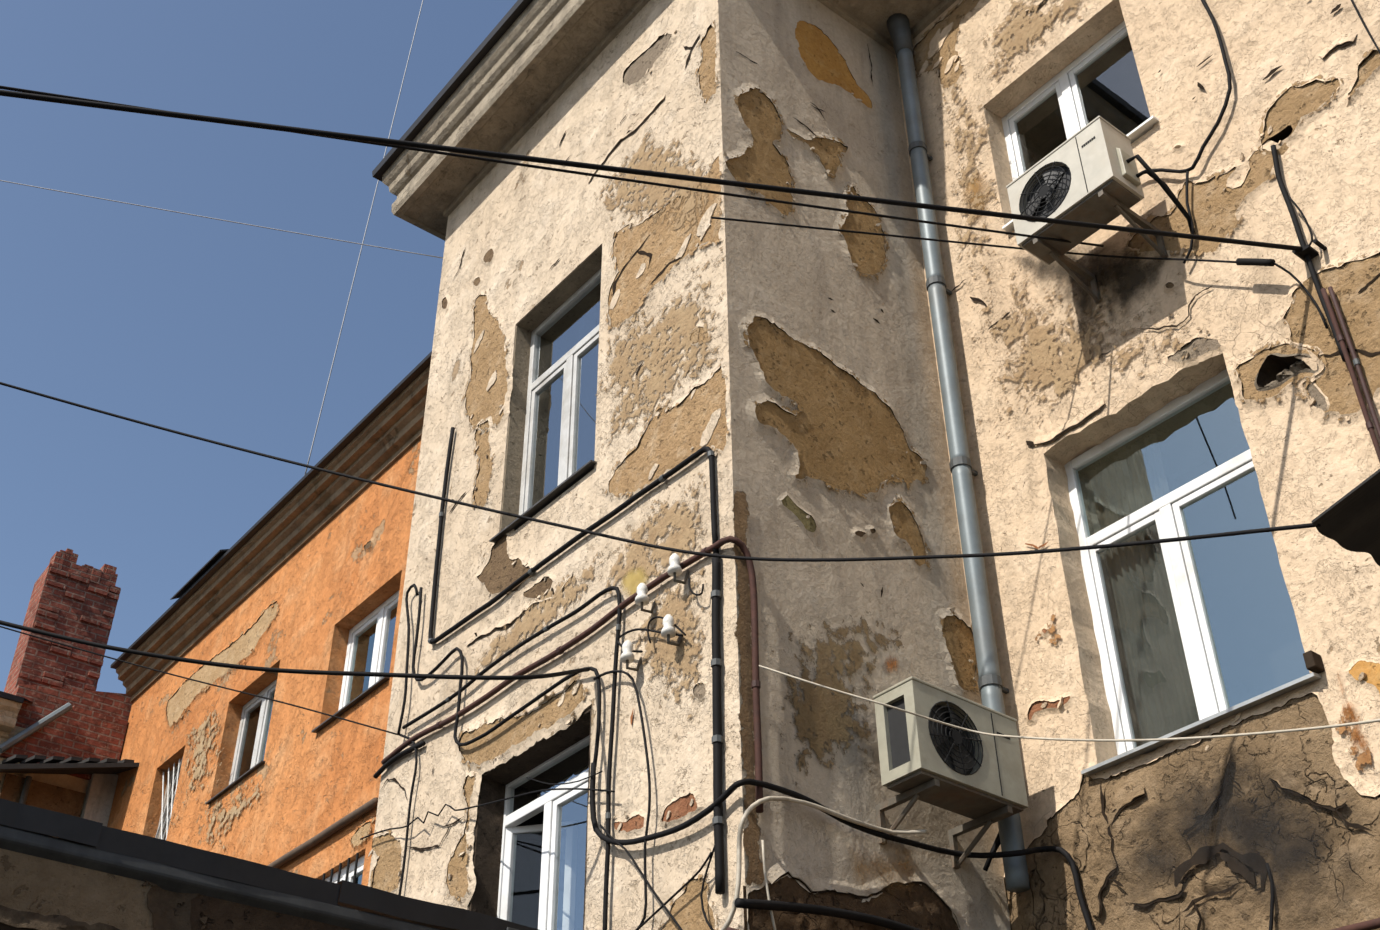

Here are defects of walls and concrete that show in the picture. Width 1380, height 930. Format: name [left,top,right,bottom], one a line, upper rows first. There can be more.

crack [684,34,700,68]
crack [559,95,665,183]
leakage [1022,249,1161,332]
flaking render [913,0,1380,436]
peeling [461,246,513,514]
peeling [474,16,932,721]
crack [0,905,120,930]
peeling [164,596,282,849]
peeling [612,787,704,839]
flaking render [650,491,1380,930]
crack [1090,783,1267,930]
crack [1202,753,1372,831]